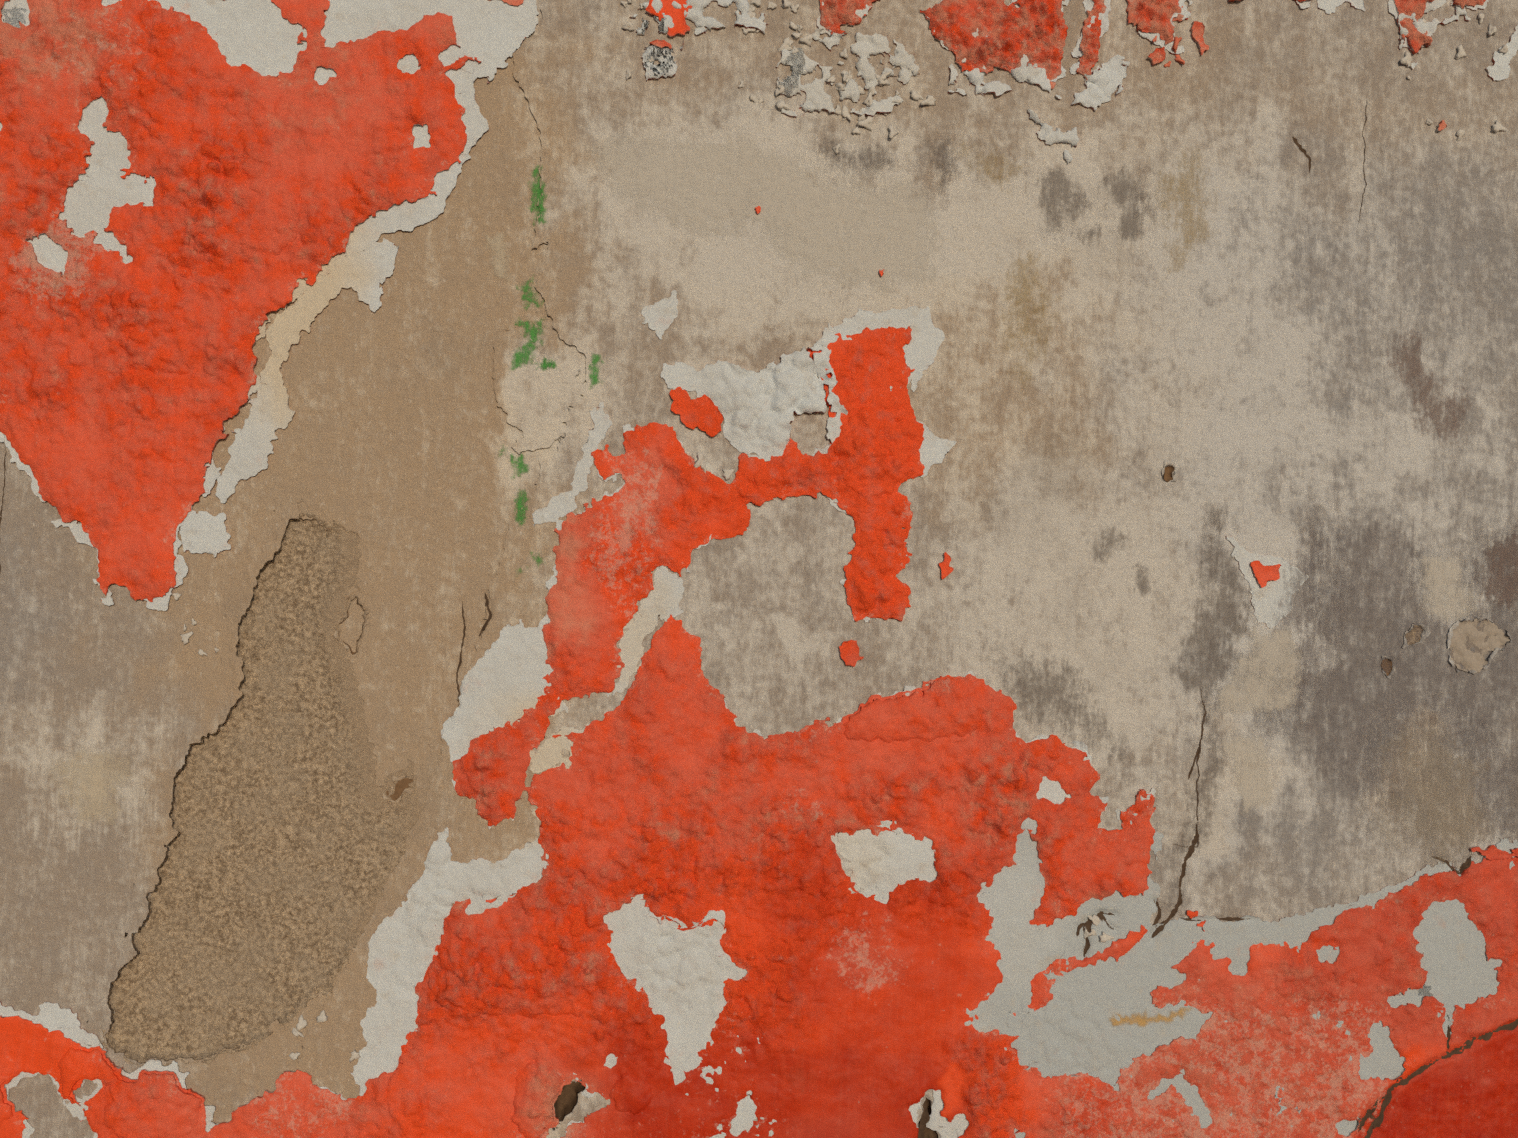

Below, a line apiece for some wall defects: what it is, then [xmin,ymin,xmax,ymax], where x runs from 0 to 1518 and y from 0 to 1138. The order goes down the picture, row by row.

water stain [1394,336,1465,437]
water stain [1422,534,1518,619]
water stain [1220,628,1301,712]
peeling [1036,776,1071,804]
peeling [831,820,938,904]
peeling [603,894,748,1096]
peeling [1387,899,1502,1037]
peeling [546,1073,611,1138]
peeling [710,1090,777,1138]
peeling [909,1089,969,1138]
peeling [1349,1021,1405,1080]
crack [1358,1015,1518,1138]